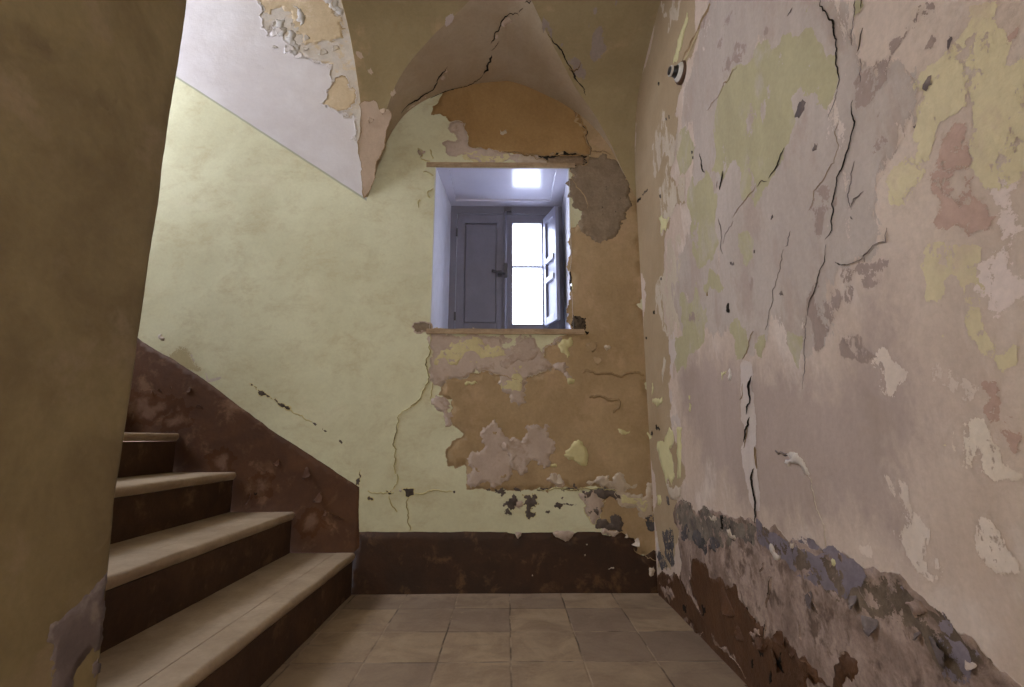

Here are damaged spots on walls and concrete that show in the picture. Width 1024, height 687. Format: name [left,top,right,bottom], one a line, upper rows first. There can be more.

peeling [256,0,397,198]
crack [402,0,531,112]
crack [718,149,784,254]
crack [802,0,887,386]
peeling [930,147,996,237]
peeling [840,258,889,303]
crack [368,334,452,531]
peeling [411,0,860,687]
crack [740,232,790,523]
peeling [839,334,877,364]
peeling [47,572,108,687]
peeling [848,575,993,685]